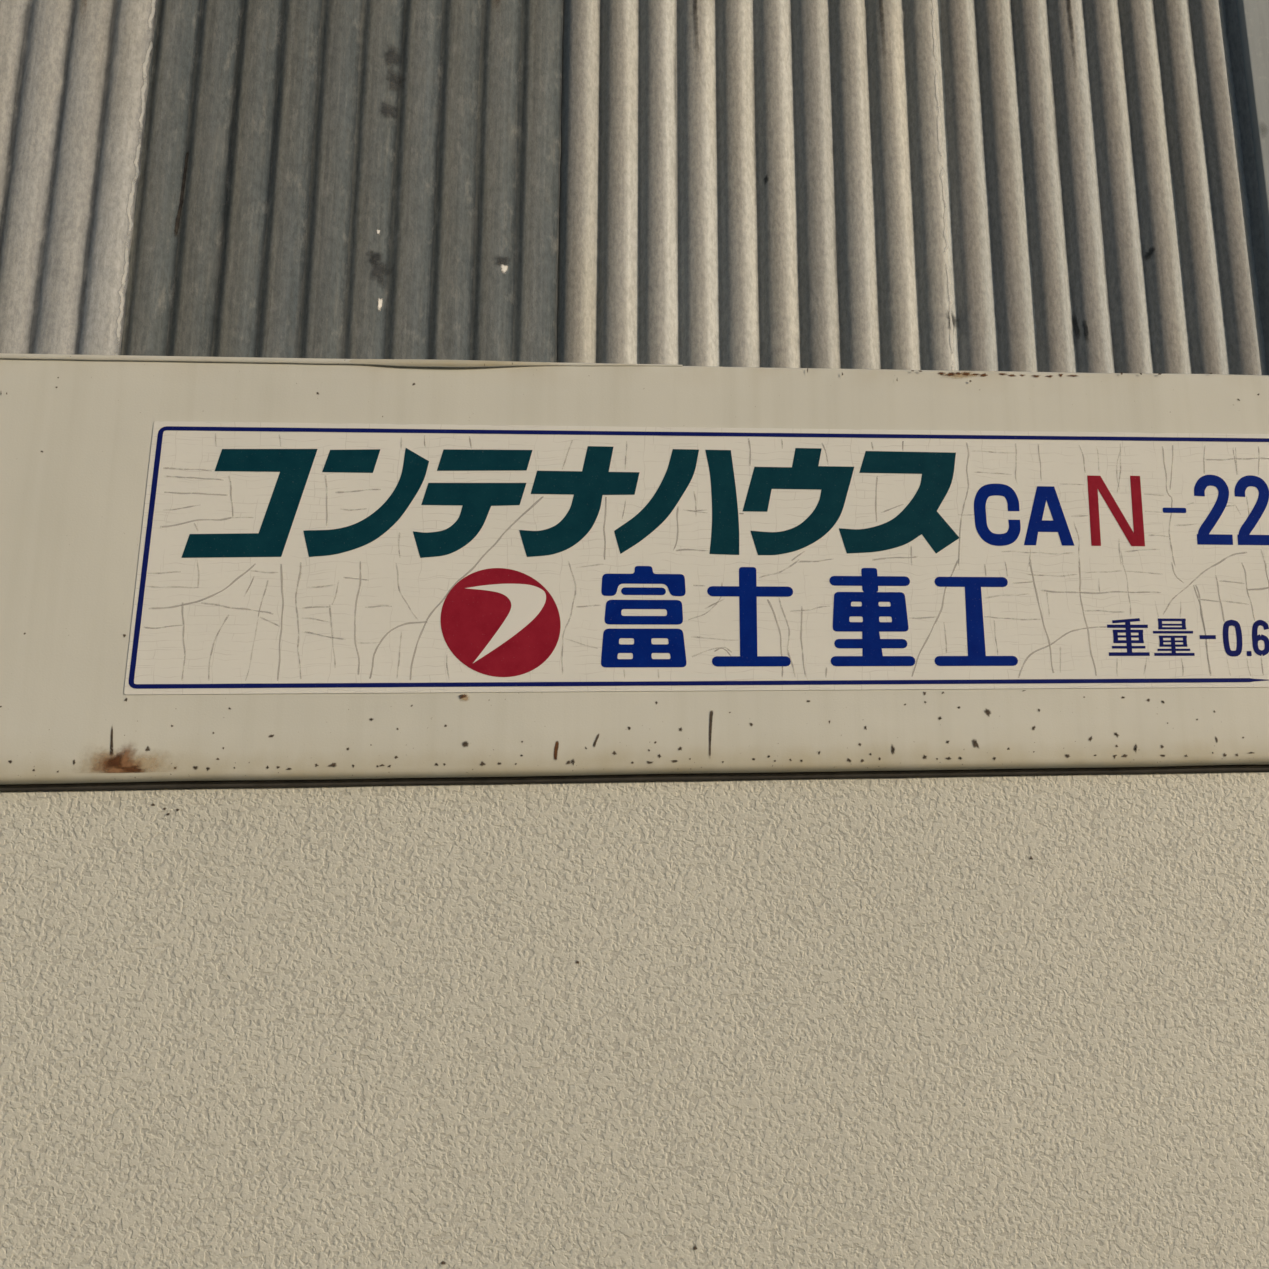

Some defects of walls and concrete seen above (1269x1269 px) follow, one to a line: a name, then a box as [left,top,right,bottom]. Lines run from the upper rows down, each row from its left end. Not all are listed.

rust [95,727,155,773]